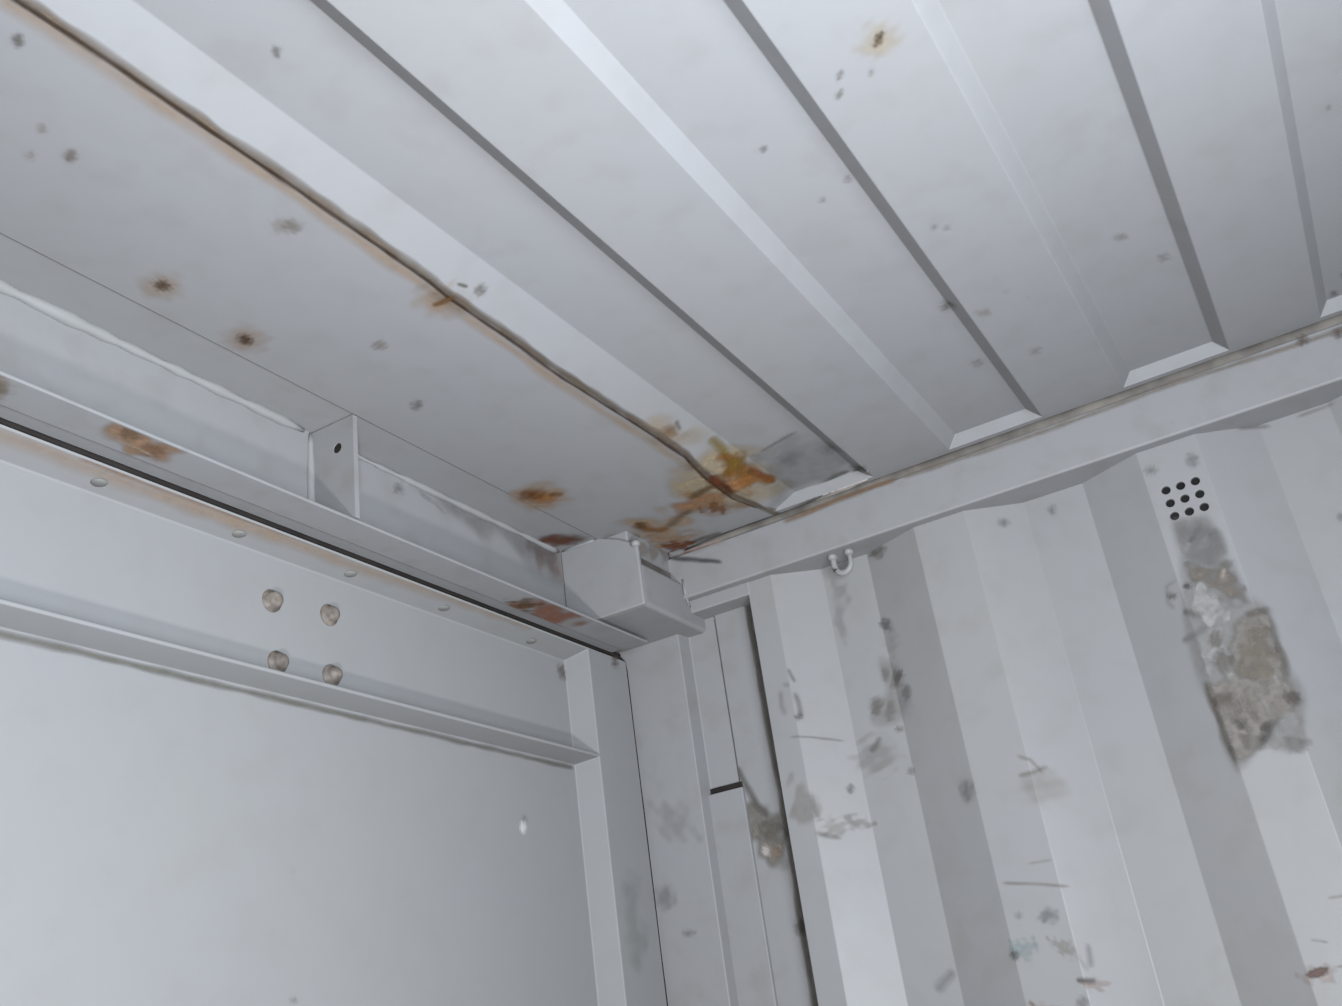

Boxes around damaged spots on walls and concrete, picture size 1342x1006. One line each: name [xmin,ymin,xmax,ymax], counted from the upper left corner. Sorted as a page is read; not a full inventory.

corrosion [1020,329,1342,440]
corrosion [106,424,181,460]
corrosion [630,439,774,563]
corrosion [789,481,892,520]
corrosion [509,599,582,624]